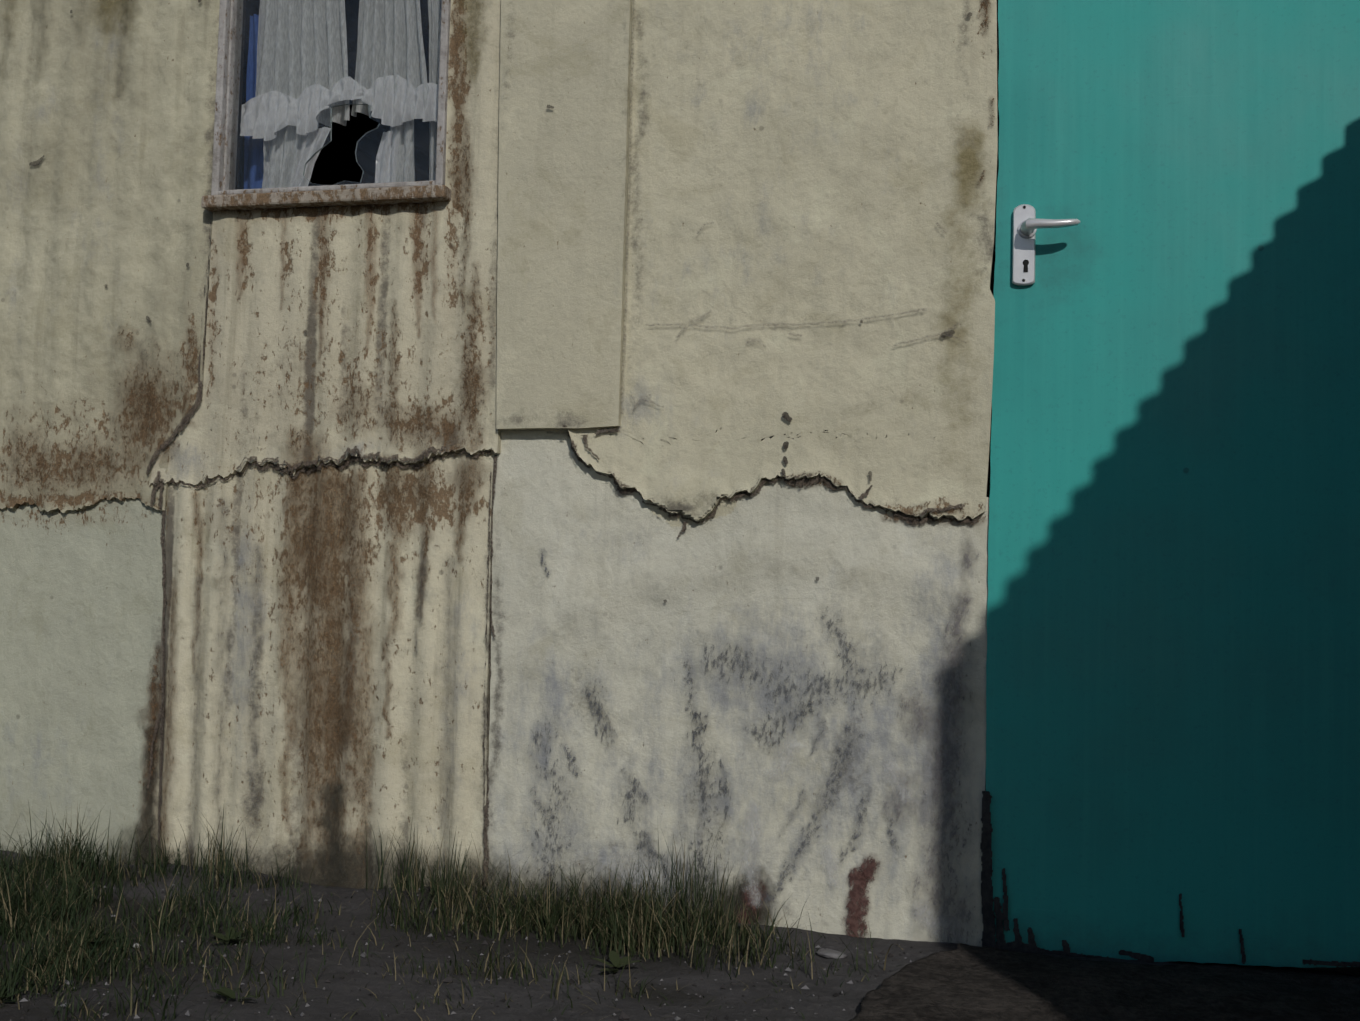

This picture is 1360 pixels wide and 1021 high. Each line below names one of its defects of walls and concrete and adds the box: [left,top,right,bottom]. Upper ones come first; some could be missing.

rust [6,335,199,502]
rust [280,430,384,873]
rust [385,459,431,631]
rust [385,0,486,560]
leakage [214,606,902,924]
crack [547,8,981,538]